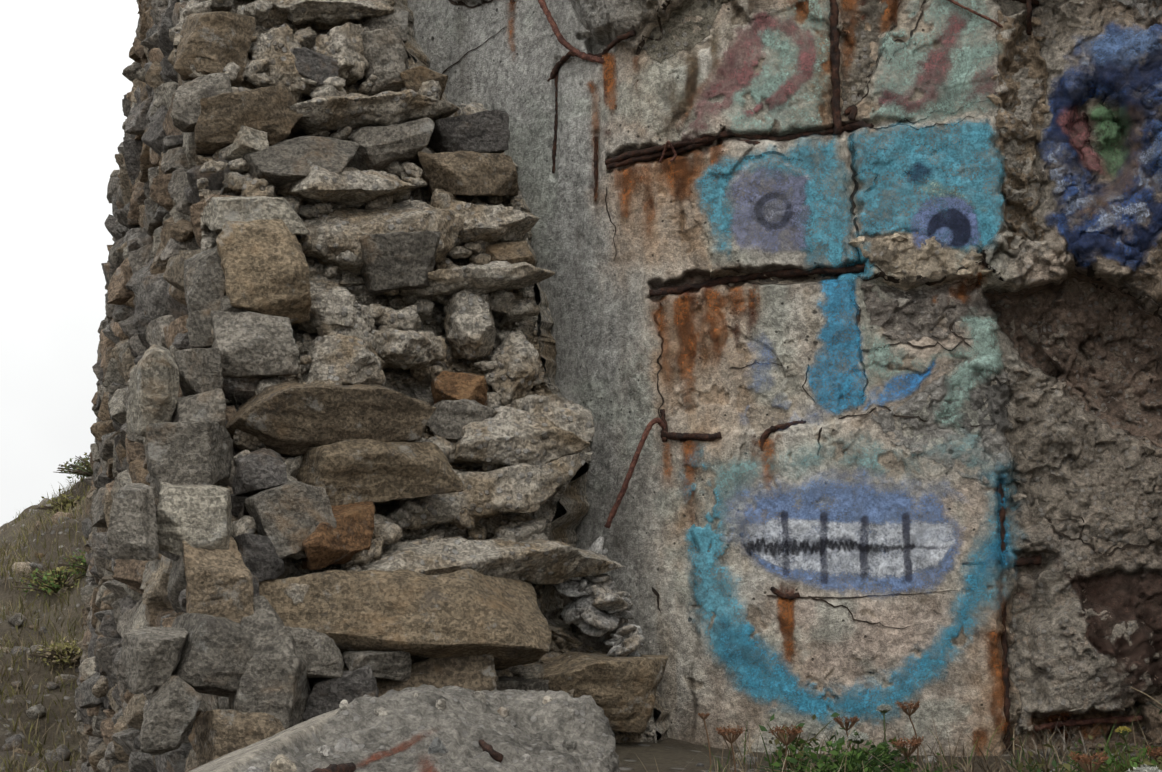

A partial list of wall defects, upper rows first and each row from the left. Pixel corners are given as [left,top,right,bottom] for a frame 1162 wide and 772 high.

spalling [640,0,728,63]
corrosion [948,0,1039,36]
corrosion [538,0,874,214]
crack [653,302,664,419]
corrosion [649,265,865,387]
spalling [848,232,1162,551]
corrosion [604,409,722,529]
corrosion [770,586,800,664]
crack [767,590,960,629]
corrosion [962,482,1042,753]
spalling [1007,562,1160,737]
water stain [1065,570,1162,698]